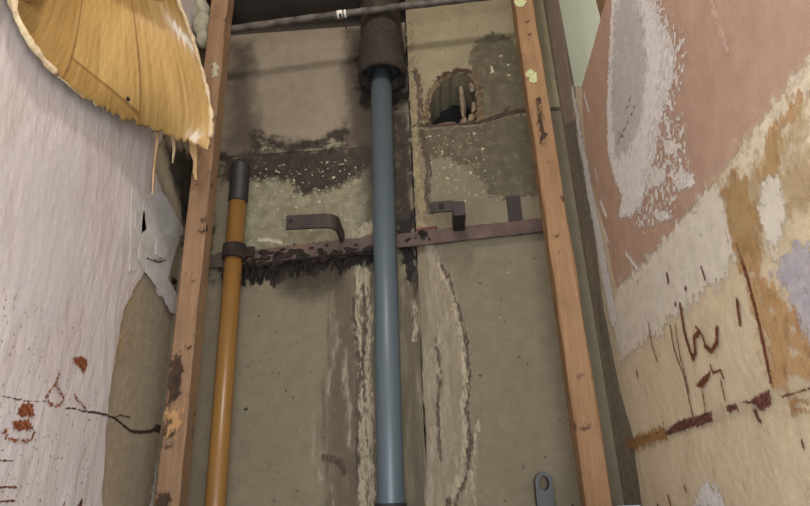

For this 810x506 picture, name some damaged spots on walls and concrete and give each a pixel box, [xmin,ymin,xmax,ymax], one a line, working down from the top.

spalling [421,67,485,126]
peeling [571,0,696,327]
corrosion [242,243,373,285]
corrosion [20,371,91,426]
corrosion [73,356,94,377]
crack [66,407,161,434]
water stain [308,264,377,506]
water stain [405,244,482,506]
crack [782,387,810,398]
corrosion [0,398,57,503]
peeling [694,478,725,506]